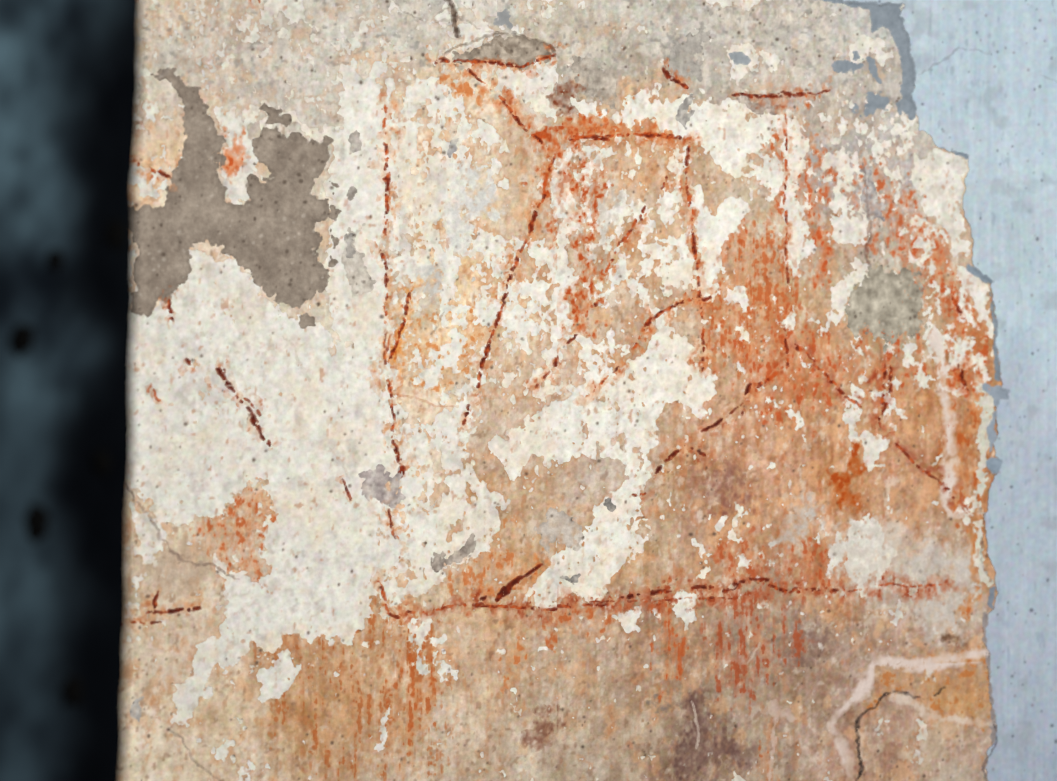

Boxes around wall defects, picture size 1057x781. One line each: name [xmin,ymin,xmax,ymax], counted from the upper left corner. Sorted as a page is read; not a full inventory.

spalling [560,141,580,168]
spalling [909,237,934,270]
spalling [722,283,749,311]
spalling [722,305,752,343]
spalling [942,334,979,366]
corrosion [238,41,994,781]
spalling [128,561,156,617]
spalling [736,555,751,578]
spalling [756,590,783,655]
spalling [327,708,390,781]
crack [854,686,946,781]
spalling [835,650,997,781]